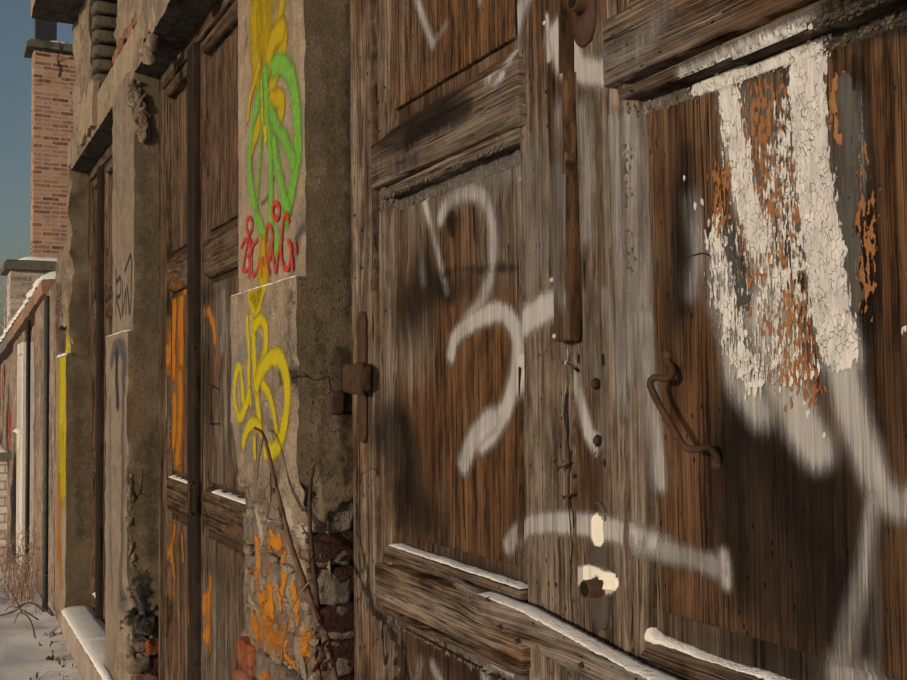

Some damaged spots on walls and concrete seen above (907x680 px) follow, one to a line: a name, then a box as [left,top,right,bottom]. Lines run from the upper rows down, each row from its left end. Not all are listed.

peeling [618,0,907,418]
flaking render [234,475,354,680]